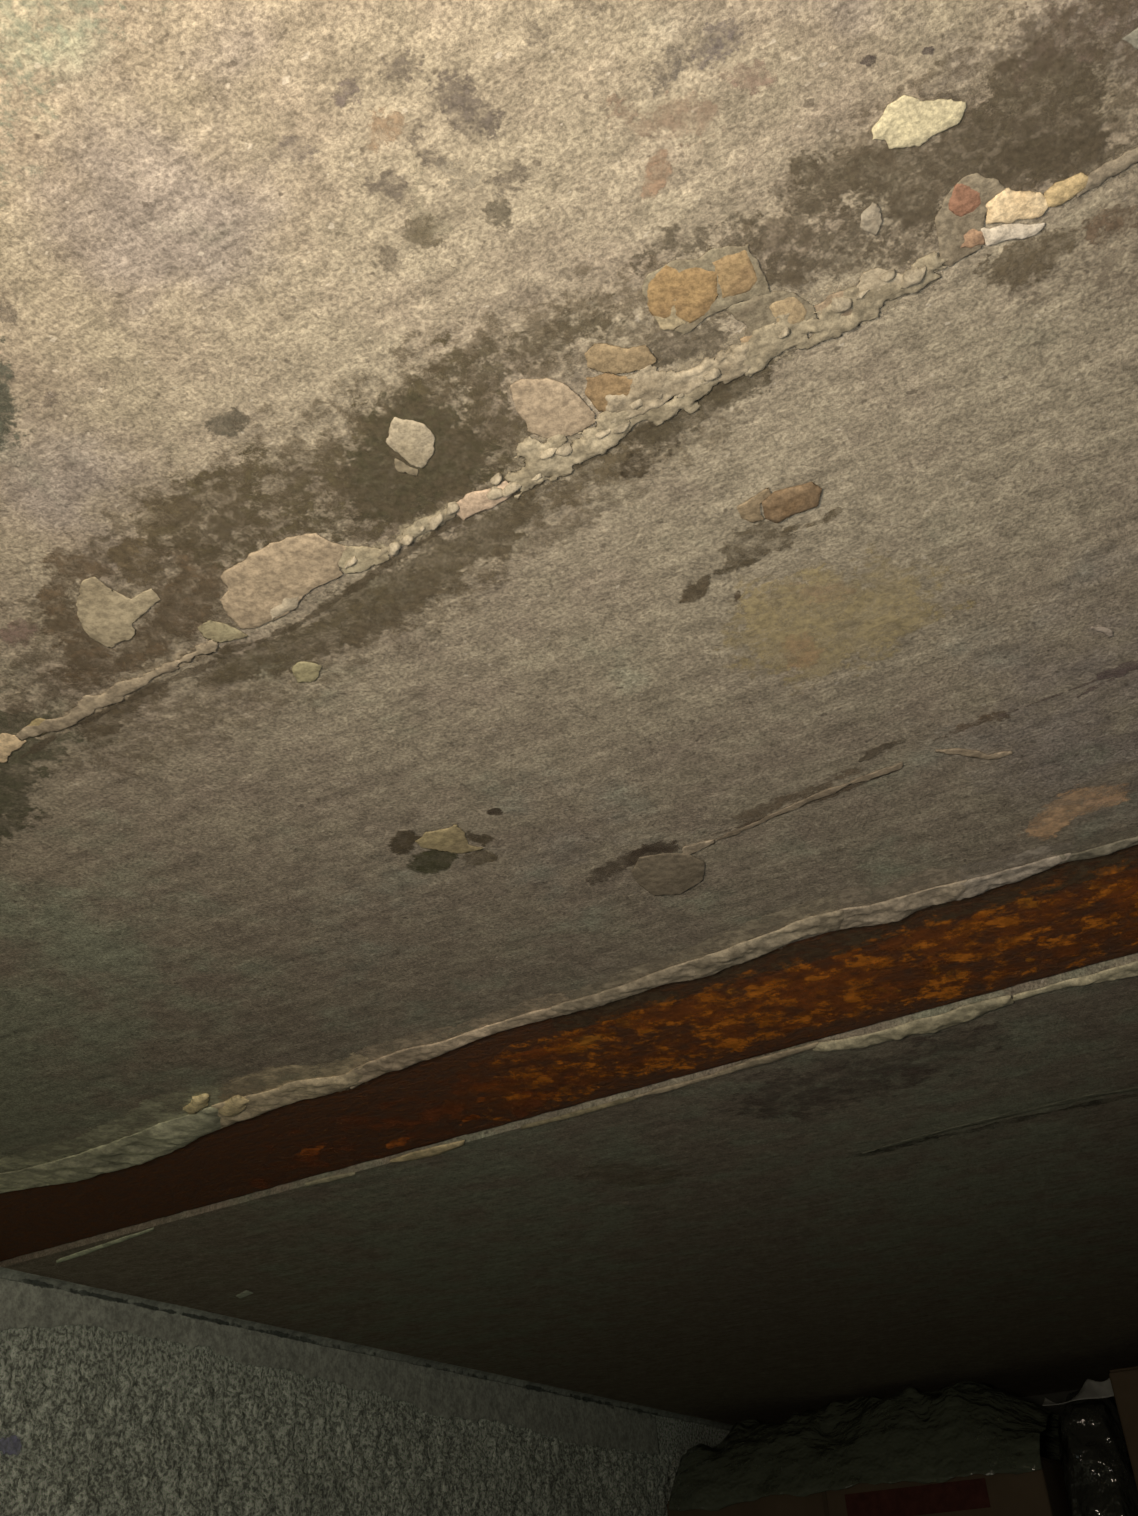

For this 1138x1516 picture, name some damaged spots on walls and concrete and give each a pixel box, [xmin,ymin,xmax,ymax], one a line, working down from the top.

peeling [871,95,966,149]
peeling [935,172,1088,267]
crack [1066,144,1138,204]
peeling [386,417,435,476]
crack [15,230,949,758]
damp [0,0,1138,844]
peeling [76,577,160,648]
peeling [198,533,390,643]
crack [592,626,1138,884]
damp [388,830,497,874]
flaking render [0,824,1138,1193]
rust [373,851,1138,1149]